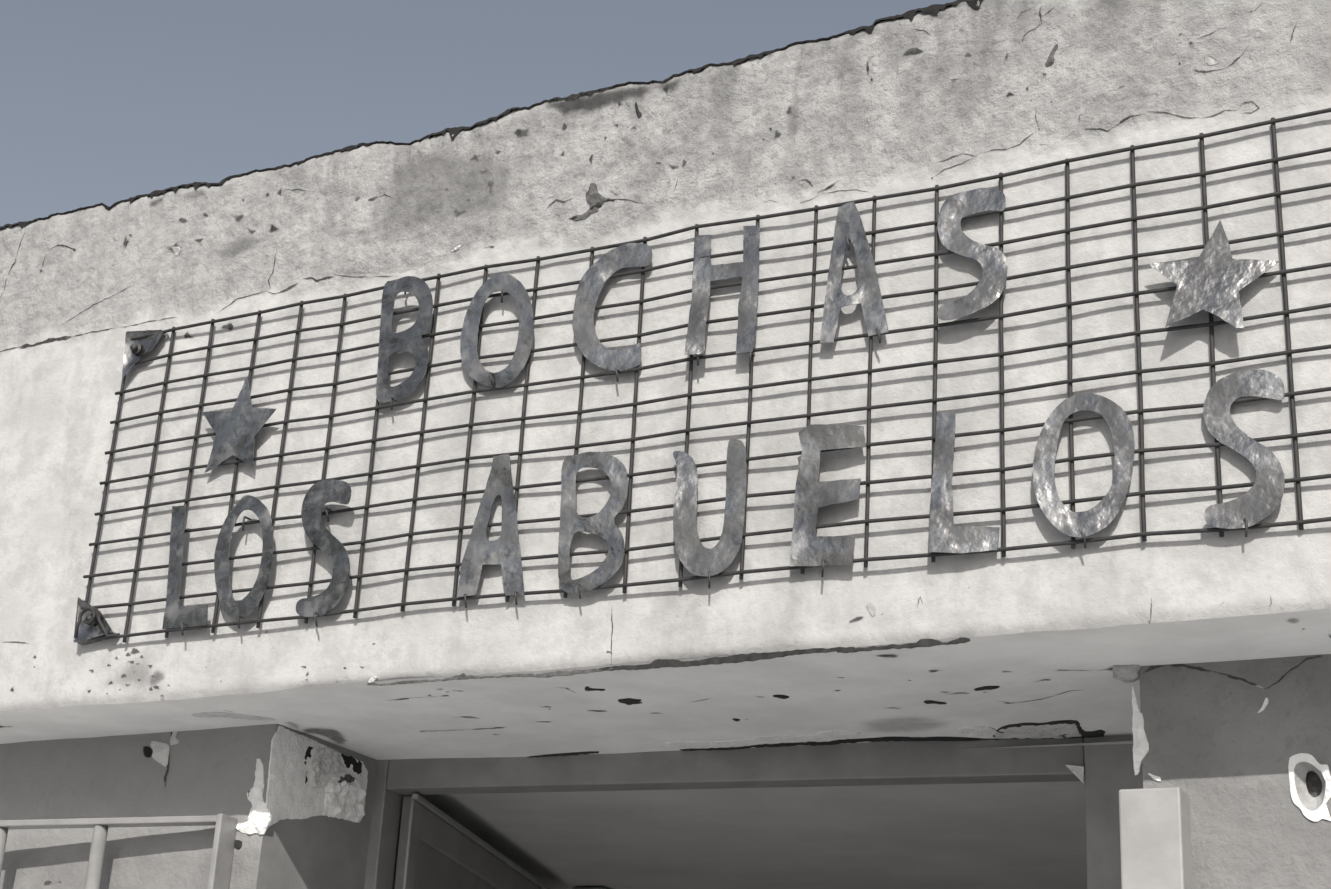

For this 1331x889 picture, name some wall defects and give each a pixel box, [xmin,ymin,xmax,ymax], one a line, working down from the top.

spalling [569,183,615,221]
crack [0,232,76,298]
crack [0,285,176,352]
crack [605,614,613,664]
crack [1146,636,1331,689]
peeling [192,710,368,849]
crack [527,750,599,758]
peeling [655,730,860,749]
crack [679,736,1000,751]
spalling [957,720,1105,739]
peeling [1132,685,1161,781]
spalling [1288,753,1331,822]